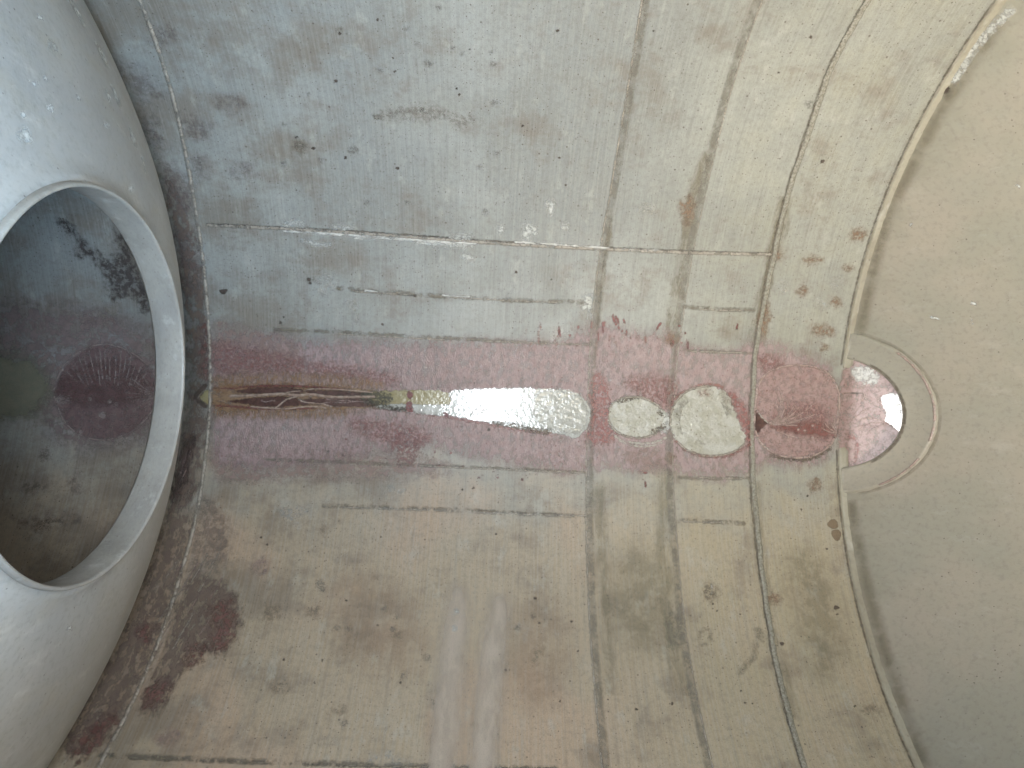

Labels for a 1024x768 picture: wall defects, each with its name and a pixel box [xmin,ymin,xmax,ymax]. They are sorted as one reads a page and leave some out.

rust [53,181,902,766]